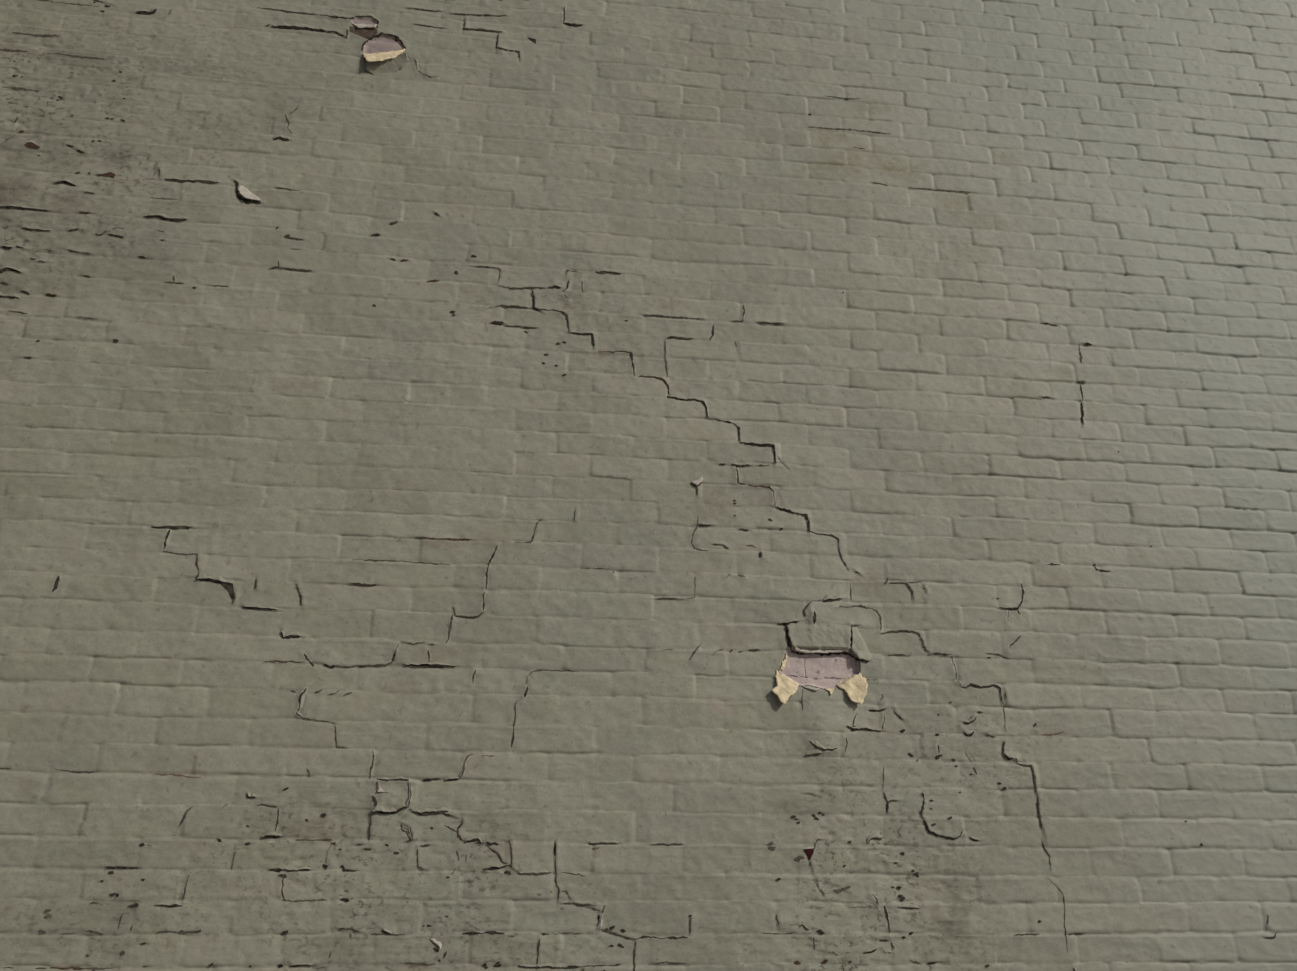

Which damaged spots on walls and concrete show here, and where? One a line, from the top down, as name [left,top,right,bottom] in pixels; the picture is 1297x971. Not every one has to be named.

crack [0,32,106,60]
crack [263,8,344,36]
peeling [320,13,433,77]
crack [407,7,520,57]
peeling [234,180,261,204]
crack [270,227,312,271]
crack [1042,323,1092,425]
crack [474,266,1083,971]
peeling [772,595,878,710]
crack [152,519,692,971]
peeling [805,737,848,756]
crack [1,843,201,971]